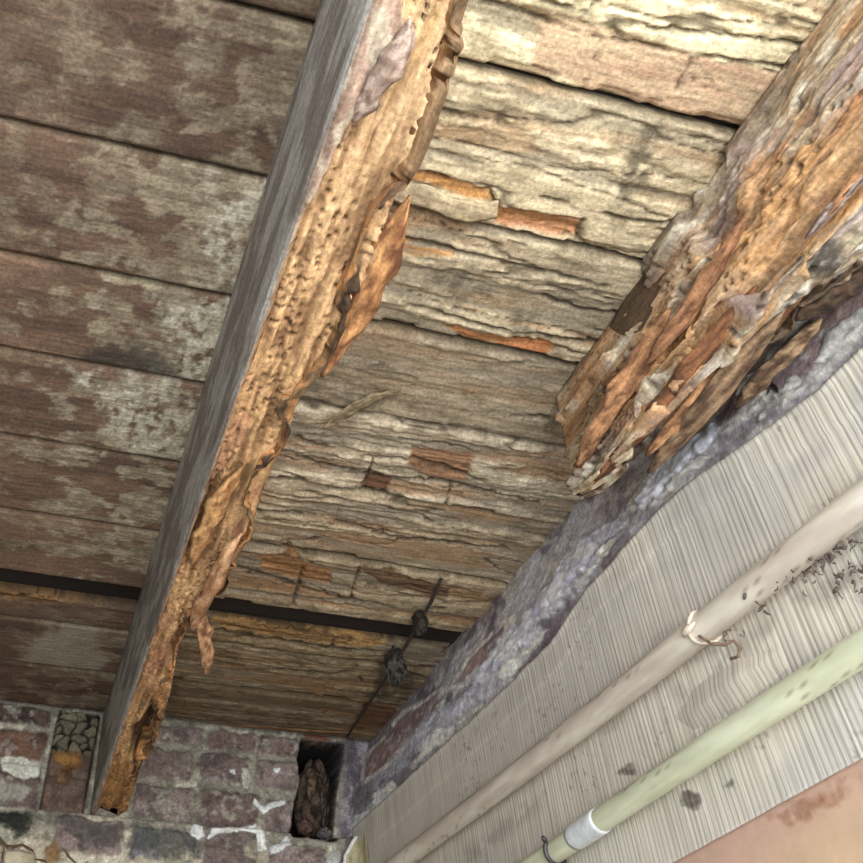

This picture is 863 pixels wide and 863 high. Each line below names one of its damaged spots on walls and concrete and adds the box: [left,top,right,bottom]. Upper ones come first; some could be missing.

peeling [351,18,416,123]
spalling [813,306,863,363]
spalling [757,376,801,421]
spalling [573,537,617,589]
spalling [496,631,546,681]
spalling [409,715,466,770]
flaking render [0,845,37,863]